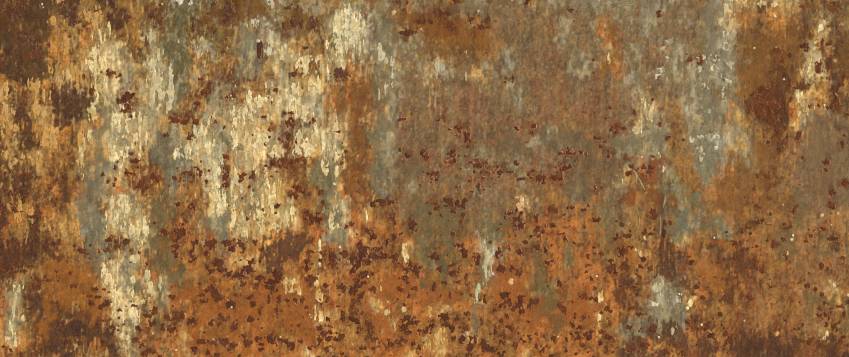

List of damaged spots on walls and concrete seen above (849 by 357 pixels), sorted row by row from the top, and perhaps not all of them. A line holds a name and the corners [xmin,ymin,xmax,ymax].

corrosion [390,0,491,60]
peeling [170,3,365,239]
corrosion [739,46,810,151]
corrosion [807,38,849,116]
corrosion [0,0,139,357]
peeling [281,277,302,296]
peeling [309,280,324,322]